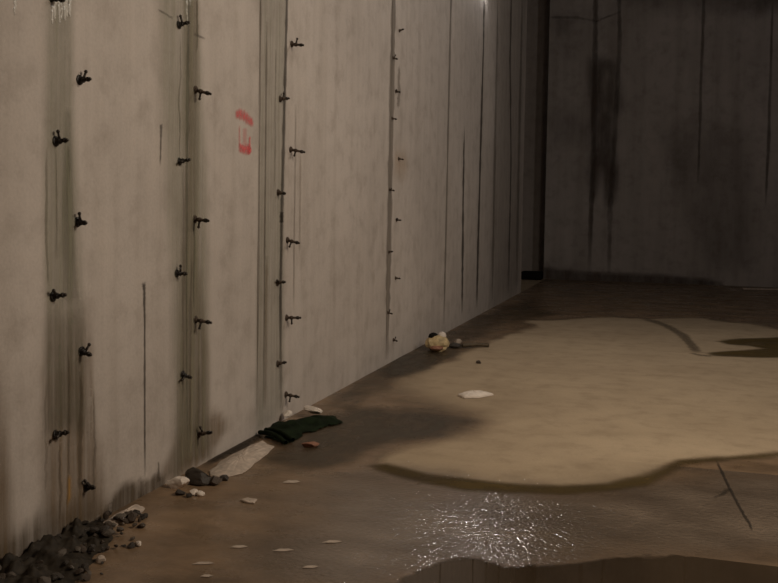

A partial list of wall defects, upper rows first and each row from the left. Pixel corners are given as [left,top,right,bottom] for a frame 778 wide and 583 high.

leakage [52,0,72,23]
crack [280,0,288,319]
crack [386,0,395,336]
crack [140,284,148,387]
leakage [75,152,778,583]
crack [718,464,752,527]